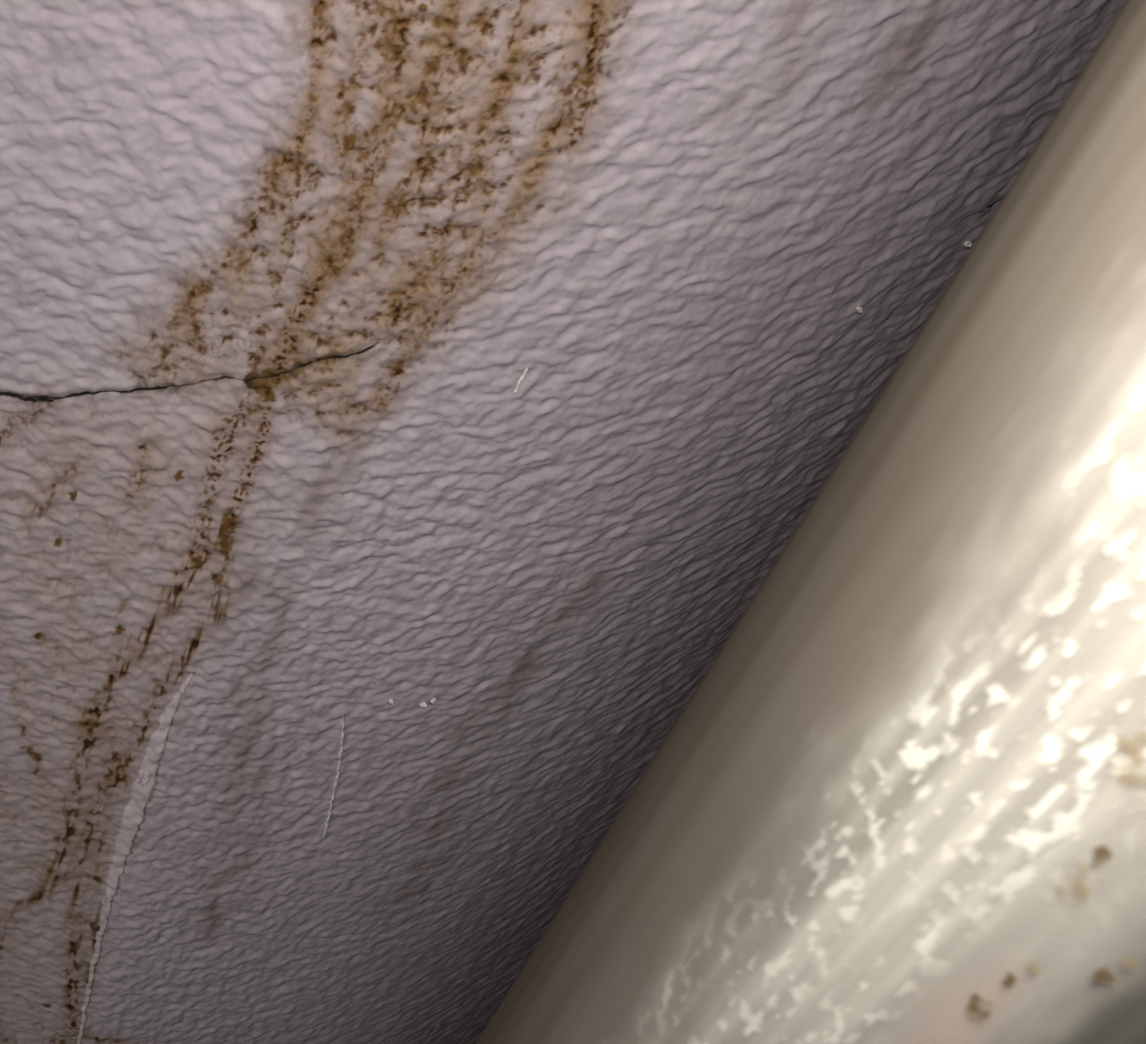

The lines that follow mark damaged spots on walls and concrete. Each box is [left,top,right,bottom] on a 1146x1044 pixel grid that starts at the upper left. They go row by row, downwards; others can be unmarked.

crack [0,342,379,403]
water stain [16,380,272,914]
water stain [51,915,100,1044]